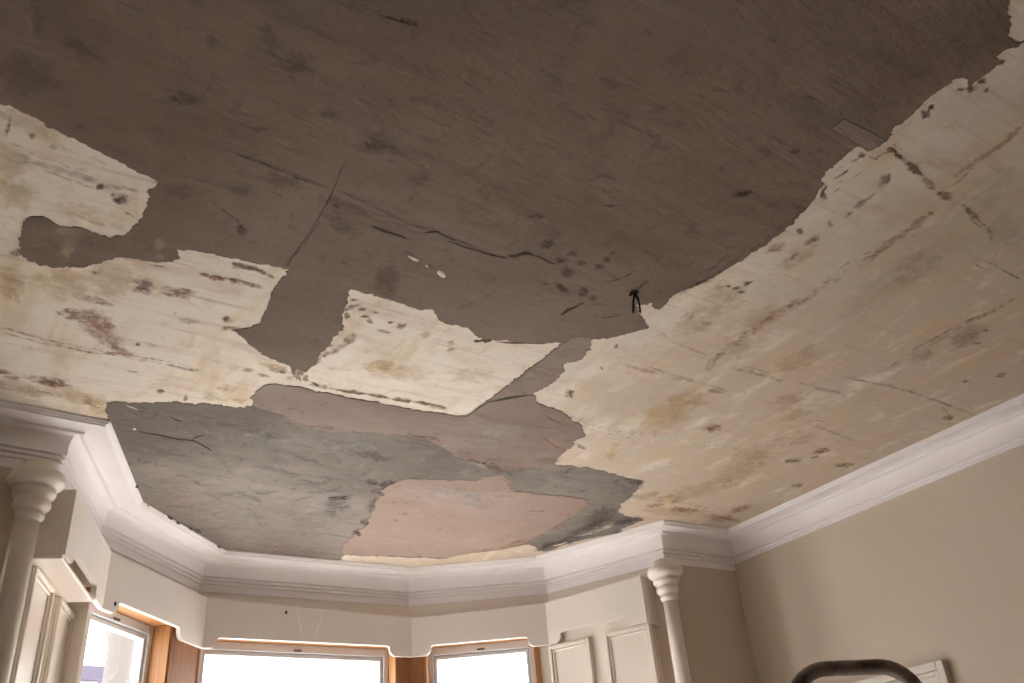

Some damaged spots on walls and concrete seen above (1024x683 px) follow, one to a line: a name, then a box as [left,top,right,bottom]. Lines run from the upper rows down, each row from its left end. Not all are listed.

spalling [448,241,556,265]
damp [200,263,273,287]
peeling [338,390,445,409]
crack [137,416,212,451]